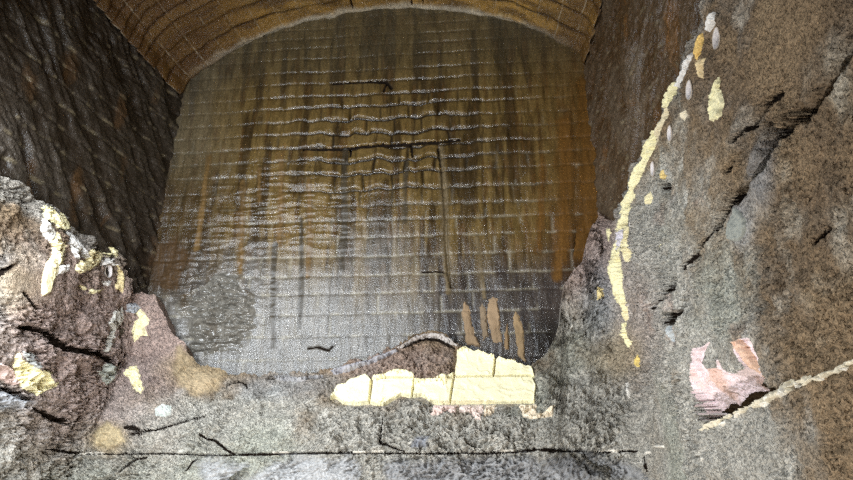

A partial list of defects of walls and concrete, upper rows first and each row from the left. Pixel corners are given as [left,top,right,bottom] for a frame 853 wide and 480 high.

crack [726,90,819,173]
crack [0,265,15,277]
leakage [340,149,348,271]
crack [651,192,747,326]
crack [814,230,831,245]
crack [17,292,120,365]
spalling [0,351,59,396]
crack [0,387,70,424]
flaking render [274,346,555,421]
spalling [689,338,776,421]
crack [45,415,648,478]